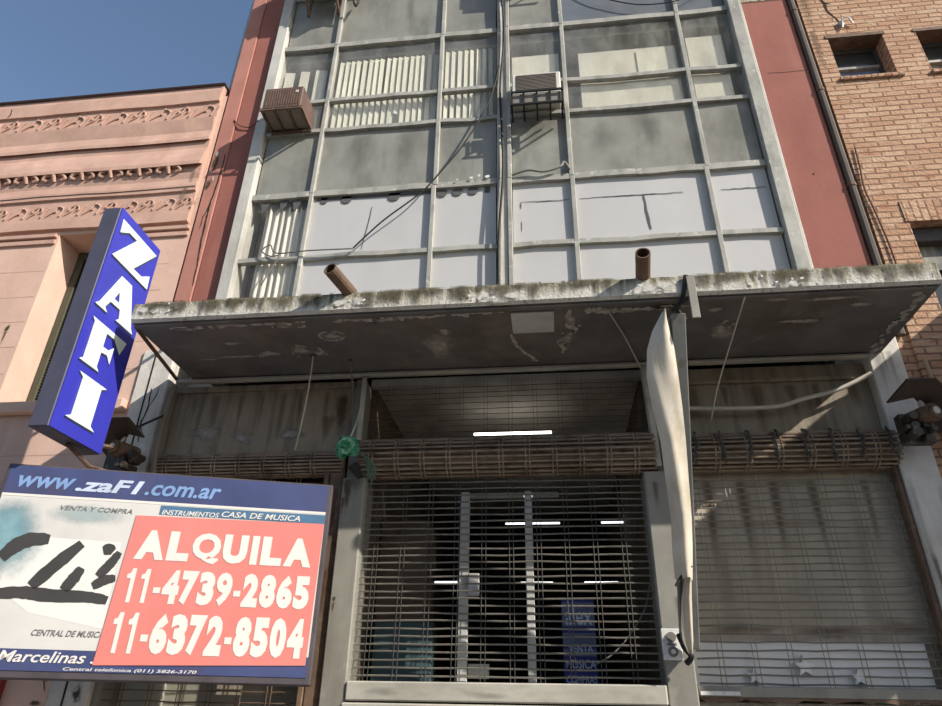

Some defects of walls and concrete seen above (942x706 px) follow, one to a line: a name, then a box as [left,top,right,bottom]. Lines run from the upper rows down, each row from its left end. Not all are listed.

crack [820,0,839,22]
crack [192,154,226,286]
leakage [302,293,334,306]
leakage [363,287,439,306]
leakage [451,282,541,298]
leakage [562,278,612,292]